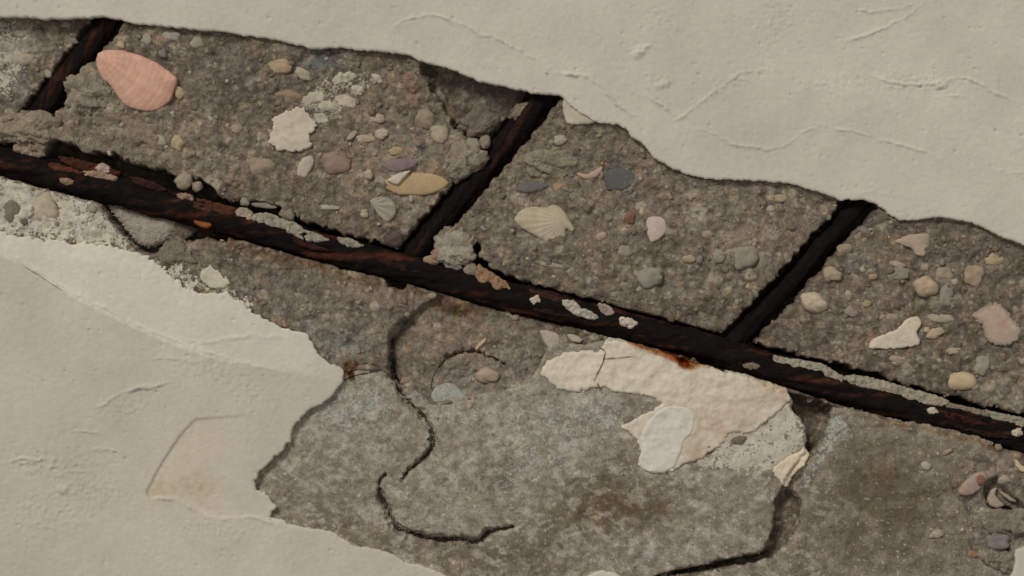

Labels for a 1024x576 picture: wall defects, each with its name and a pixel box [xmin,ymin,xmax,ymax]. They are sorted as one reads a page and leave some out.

spalling [0,18,97,148]
spalling [31,20,530,252]
crack [344,347,514,544]
spalling [0,176,889,576]
spalling [451,96,848,336]
corrosion [634,343,707,368]
crack [659,550,767,576]
spalling [747,203,1024,418]
spalling [948,444,1024,576]